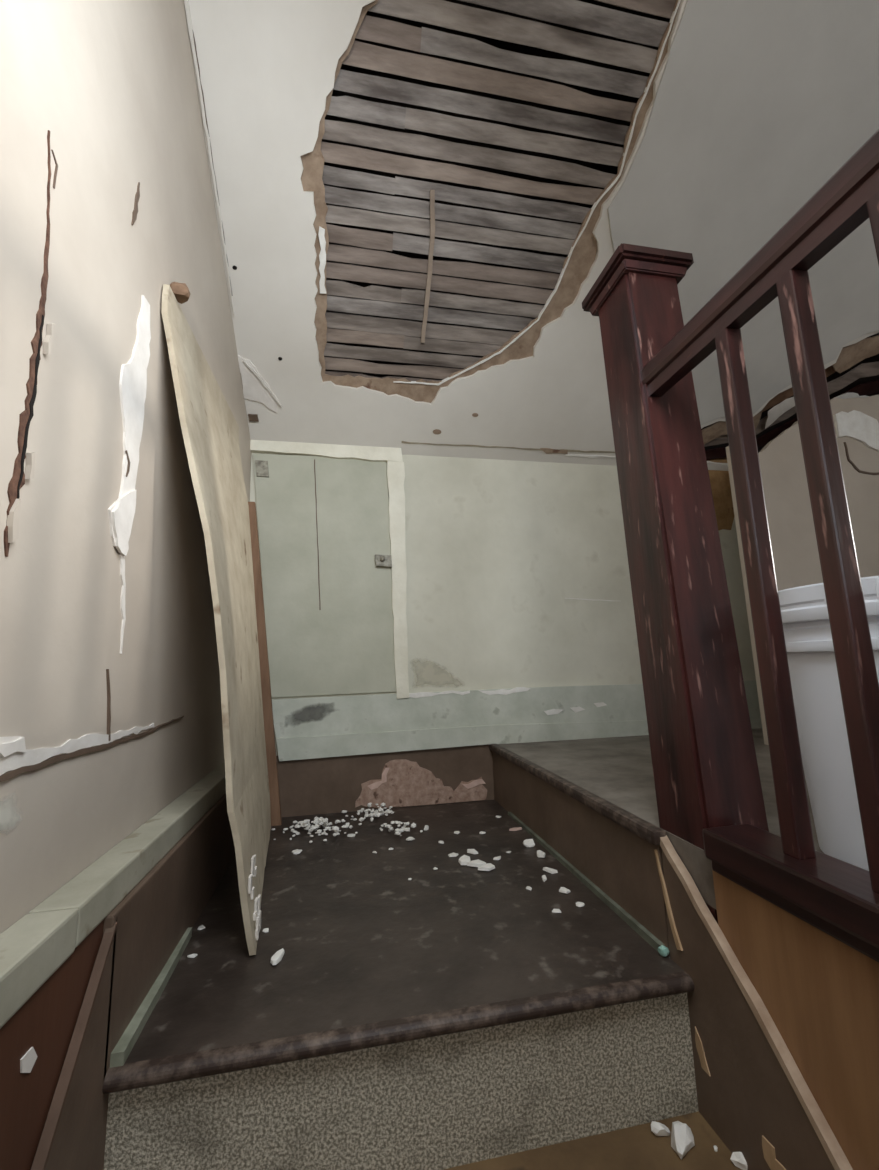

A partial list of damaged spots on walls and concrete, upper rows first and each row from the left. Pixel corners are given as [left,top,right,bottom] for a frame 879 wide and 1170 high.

spalling [301,0,681,403]
crack [4,130,58,557]
spalling [753,387,798,448]
spalling [825,335,879,475]
peeling [108,295,151,654]
water stain [292,705,332,722]
peeling [0,723,154,776]
peeling [355,759,487,809]
peeling [762,1135,786,1170]